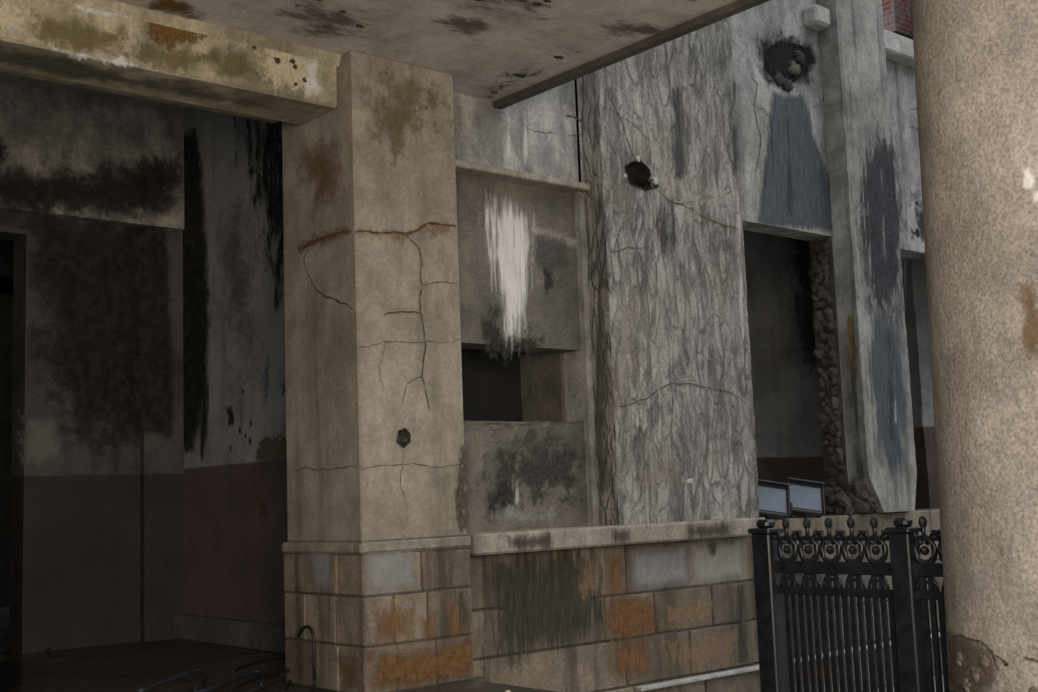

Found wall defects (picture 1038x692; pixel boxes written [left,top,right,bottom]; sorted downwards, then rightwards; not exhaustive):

rust [139,0,219,72]
peeling [764,42,796,92]
crack [751,77,768,171]
hole [624,156,659,191]
damp [757,31,832,372]
damp [0,130,209,461]
crack [298,222,463,410]
damp [482,200,593,360]
damp [856,134,924,477]
crack [615,382,746,448]
rust [370,606,473,688]
spalling [947,631,999,692]